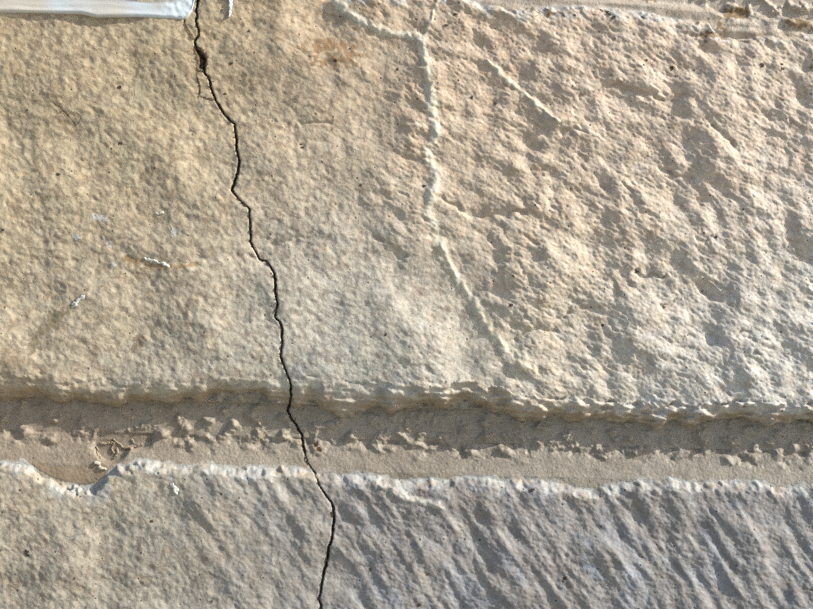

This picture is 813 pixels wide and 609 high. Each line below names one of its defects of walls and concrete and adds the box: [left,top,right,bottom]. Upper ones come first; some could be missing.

crack [184,0,335,609]